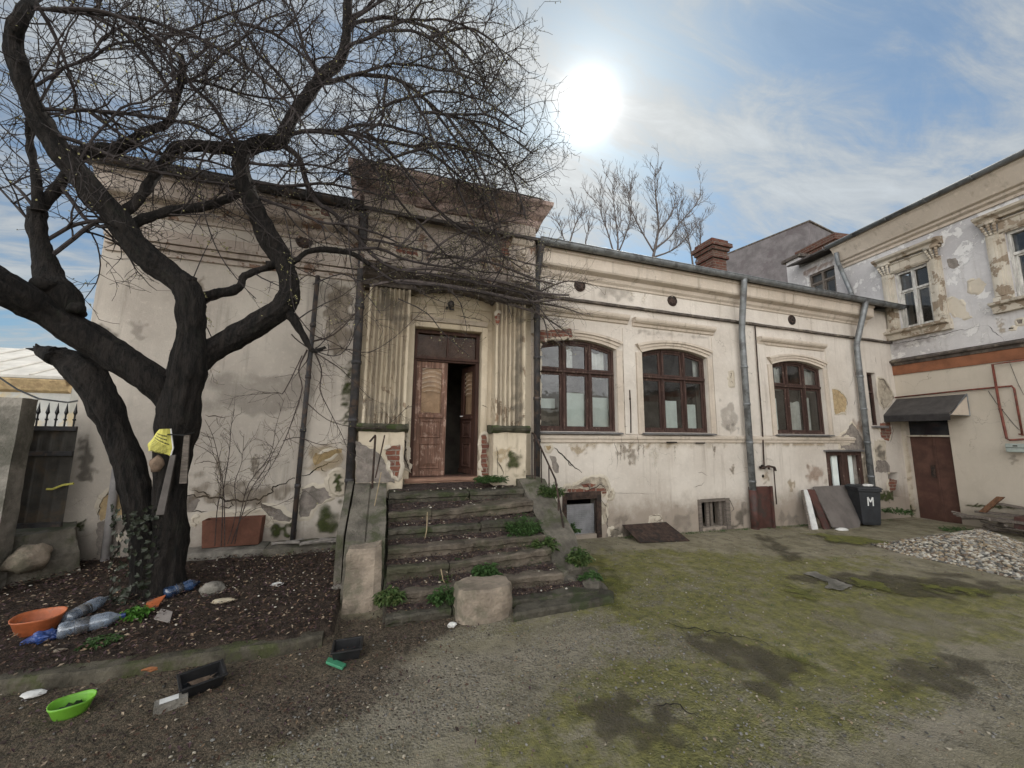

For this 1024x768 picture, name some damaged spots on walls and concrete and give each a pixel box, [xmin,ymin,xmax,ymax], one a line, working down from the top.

flaking render [215,433,412,528]
flaking render [563,474,623,537]
flaking render [832,376,909,492]